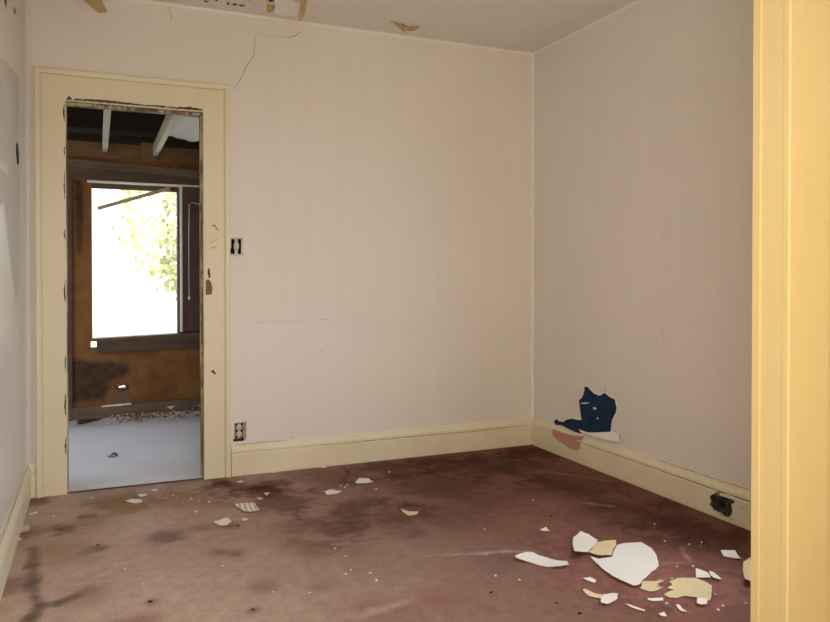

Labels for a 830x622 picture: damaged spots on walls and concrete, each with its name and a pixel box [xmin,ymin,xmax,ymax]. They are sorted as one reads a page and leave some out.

peeling [84,0,107,13]
peeling [264,0,307,22]
peeling [389,20,422,34]
peeling [552,385,621,450]